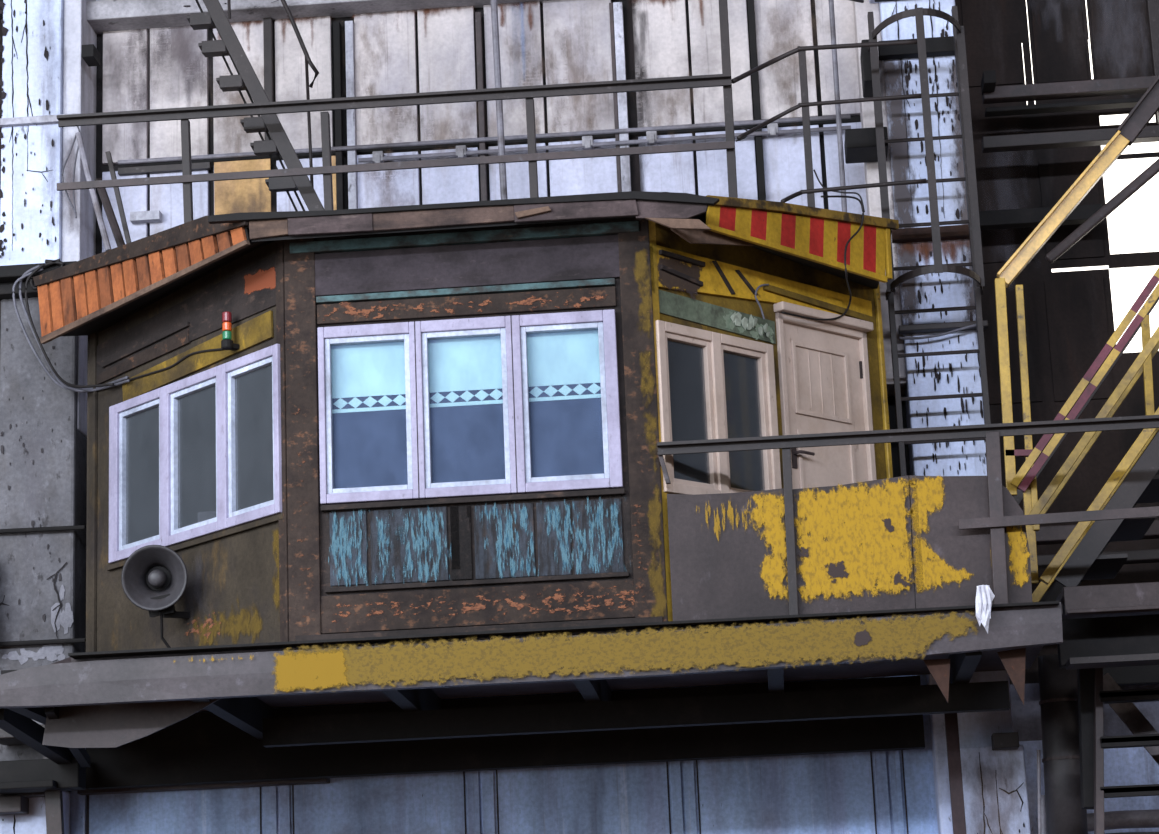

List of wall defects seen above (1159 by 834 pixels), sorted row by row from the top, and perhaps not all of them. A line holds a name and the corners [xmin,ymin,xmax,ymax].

peeling [881,59,968,229]
peeling [324,299,492,321]
peeling [506,289,605,308]
peeling [640,352,657,470]
peeling [717,309,774,343]
peeling [894,239,983,426]
peeling [272,488,978,692]
peeling [696,440,986,601]